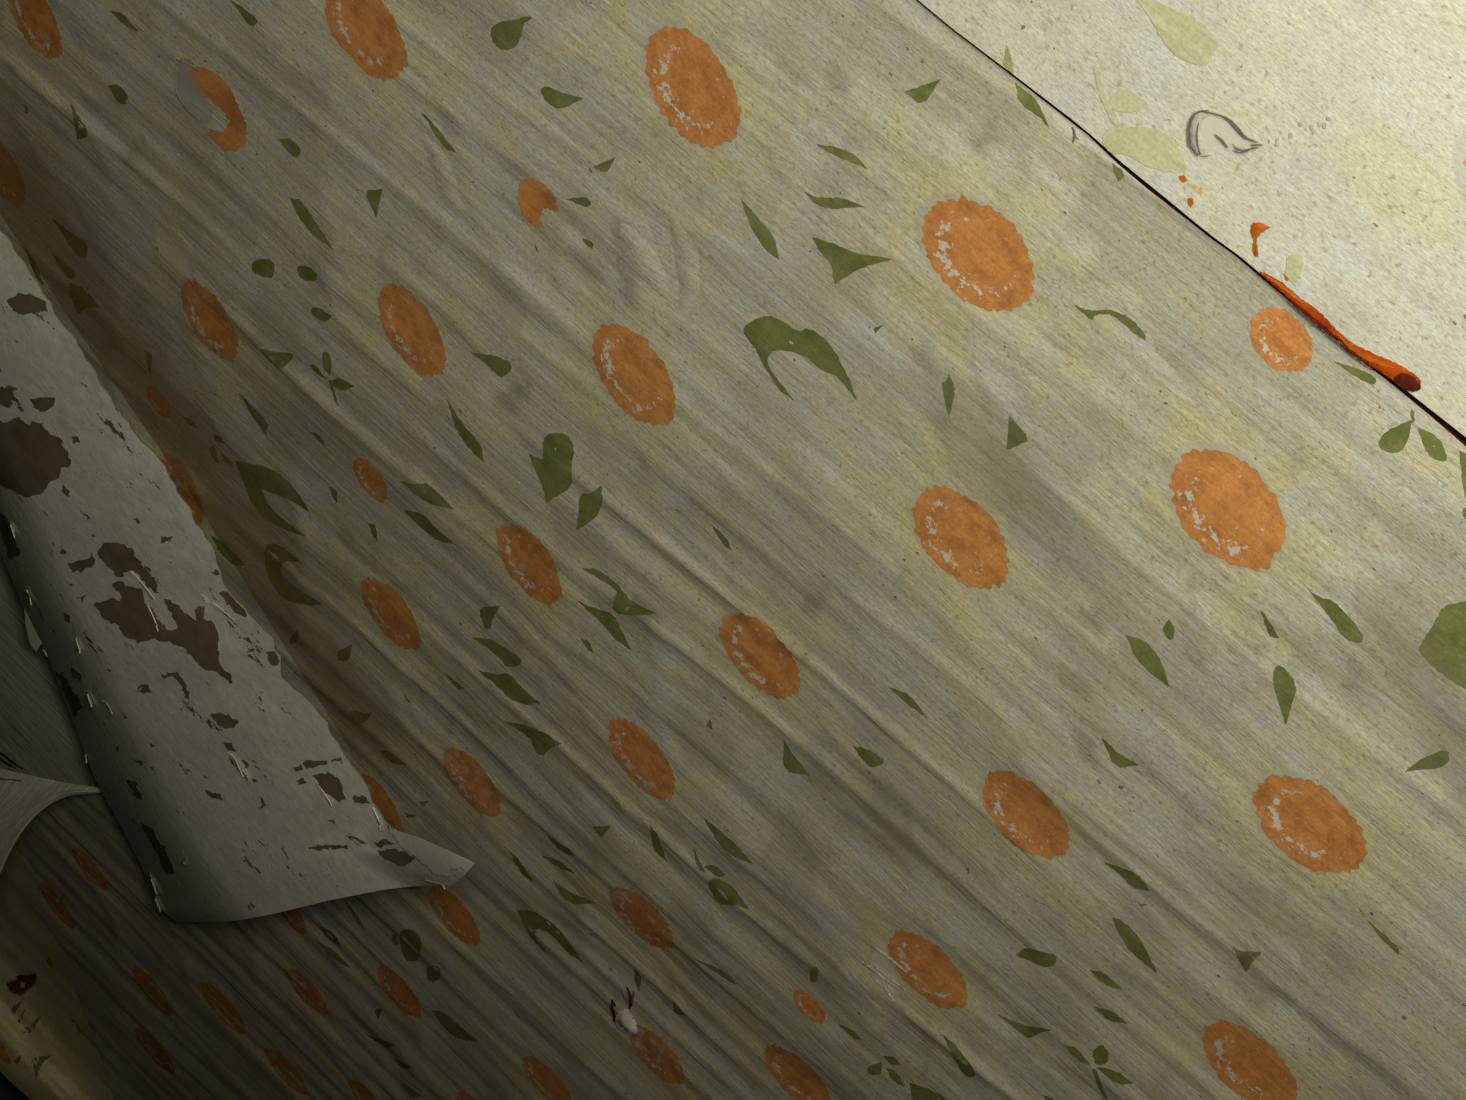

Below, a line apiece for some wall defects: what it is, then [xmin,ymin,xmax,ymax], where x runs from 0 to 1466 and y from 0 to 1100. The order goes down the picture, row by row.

crack [917,0,1466,466]
rust [1250,222,1421,392]
peeling [0,230,476,922]